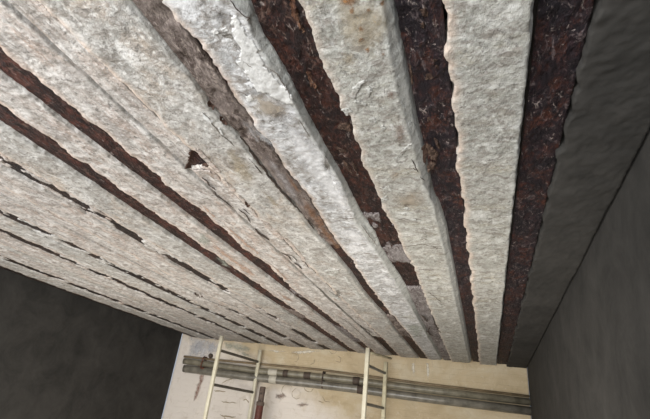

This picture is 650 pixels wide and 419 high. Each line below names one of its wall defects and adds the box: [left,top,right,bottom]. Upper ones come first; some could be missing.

peeling [212,15,294,104]
peeling [341,80,372,116]
spalling [185,148,221,174]
spalling [421,138,440,173]